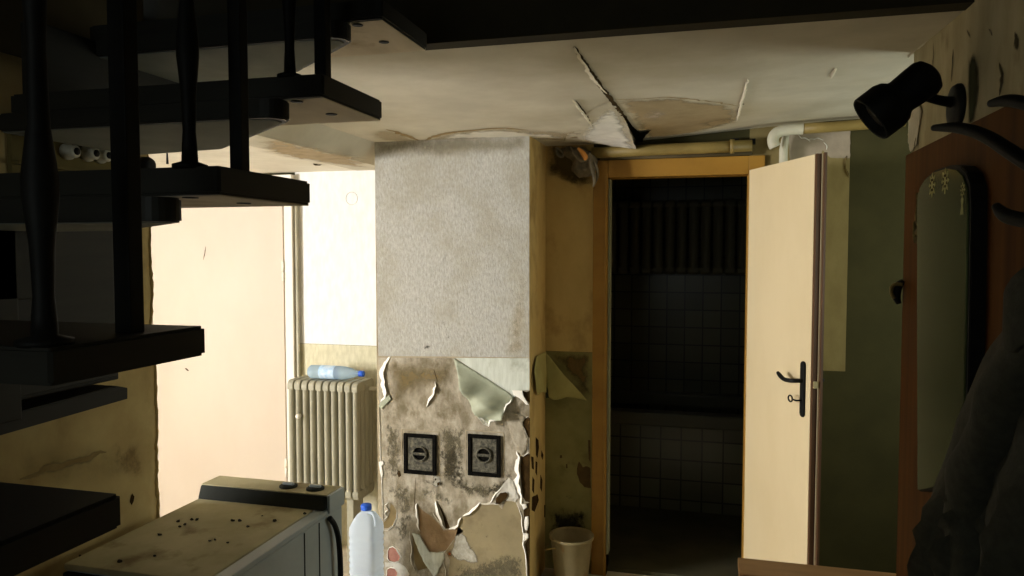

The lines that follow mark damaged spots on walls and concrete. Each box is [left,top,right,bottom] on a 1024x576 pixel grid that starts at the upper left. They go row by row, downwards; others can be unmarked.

crack [572,100,593,128]
crack [574,47,629,121]
crack [737,79,749,120]
flaking render [379,409,397,531]
flaking render [385,410,545,576]